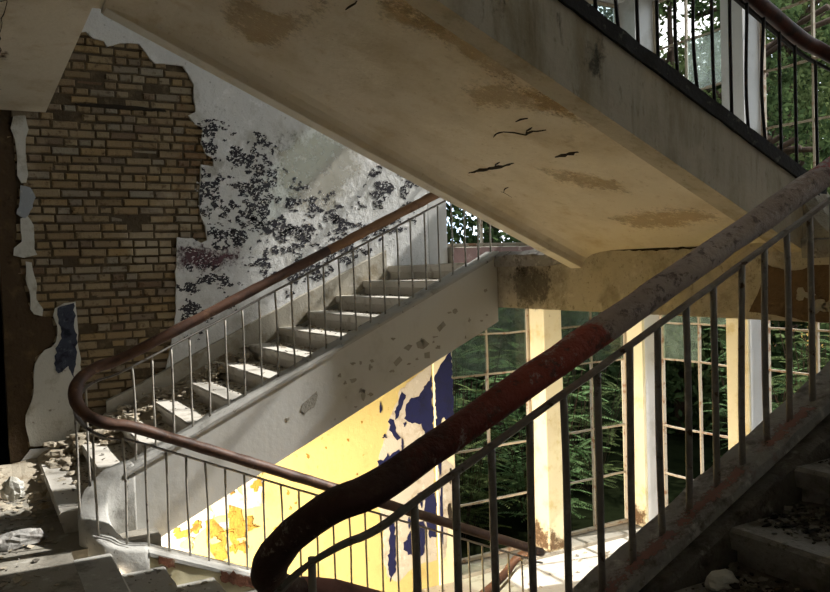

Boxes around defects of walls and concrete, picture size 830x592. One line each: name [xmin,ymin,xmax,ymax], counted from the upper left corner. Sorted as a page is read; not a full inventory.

crack [0,0,8,58]
flaking render [0,32,419,464]
damp [510,266,550,310]
peeling [377,309,458,466]
peeling [378,460,454,582]